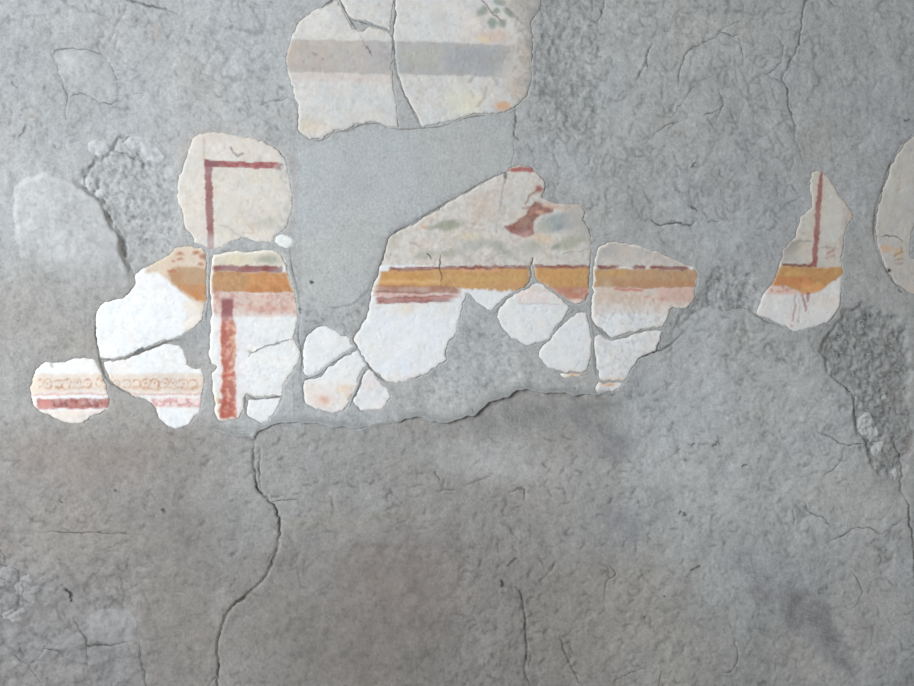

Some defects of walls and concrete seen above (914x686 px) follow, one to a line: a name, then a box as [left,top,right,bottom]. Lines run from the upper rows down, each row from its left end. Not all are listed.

spalling [81,136,177,261]
spalling [822,309,912,480]
crack [255,468,294,581]